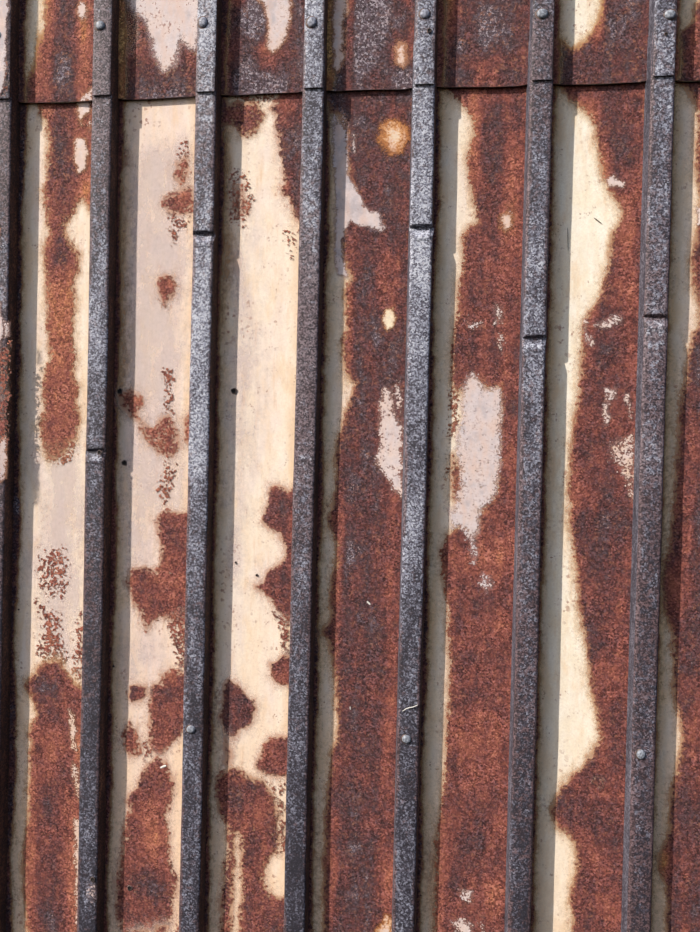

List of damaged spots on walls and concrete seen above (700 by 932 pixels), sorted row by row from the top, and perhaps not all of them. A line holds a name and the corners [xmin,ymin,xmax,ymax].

corrosion [0,0,94,932]
corrosion [104,0,197,932]
corrosion [204,0,305,932]
corrosion [308,0,415,932]
corrosion [416,0,530,932]
corrosion [531,0,649,932]
corrosion [652,0,700,932]